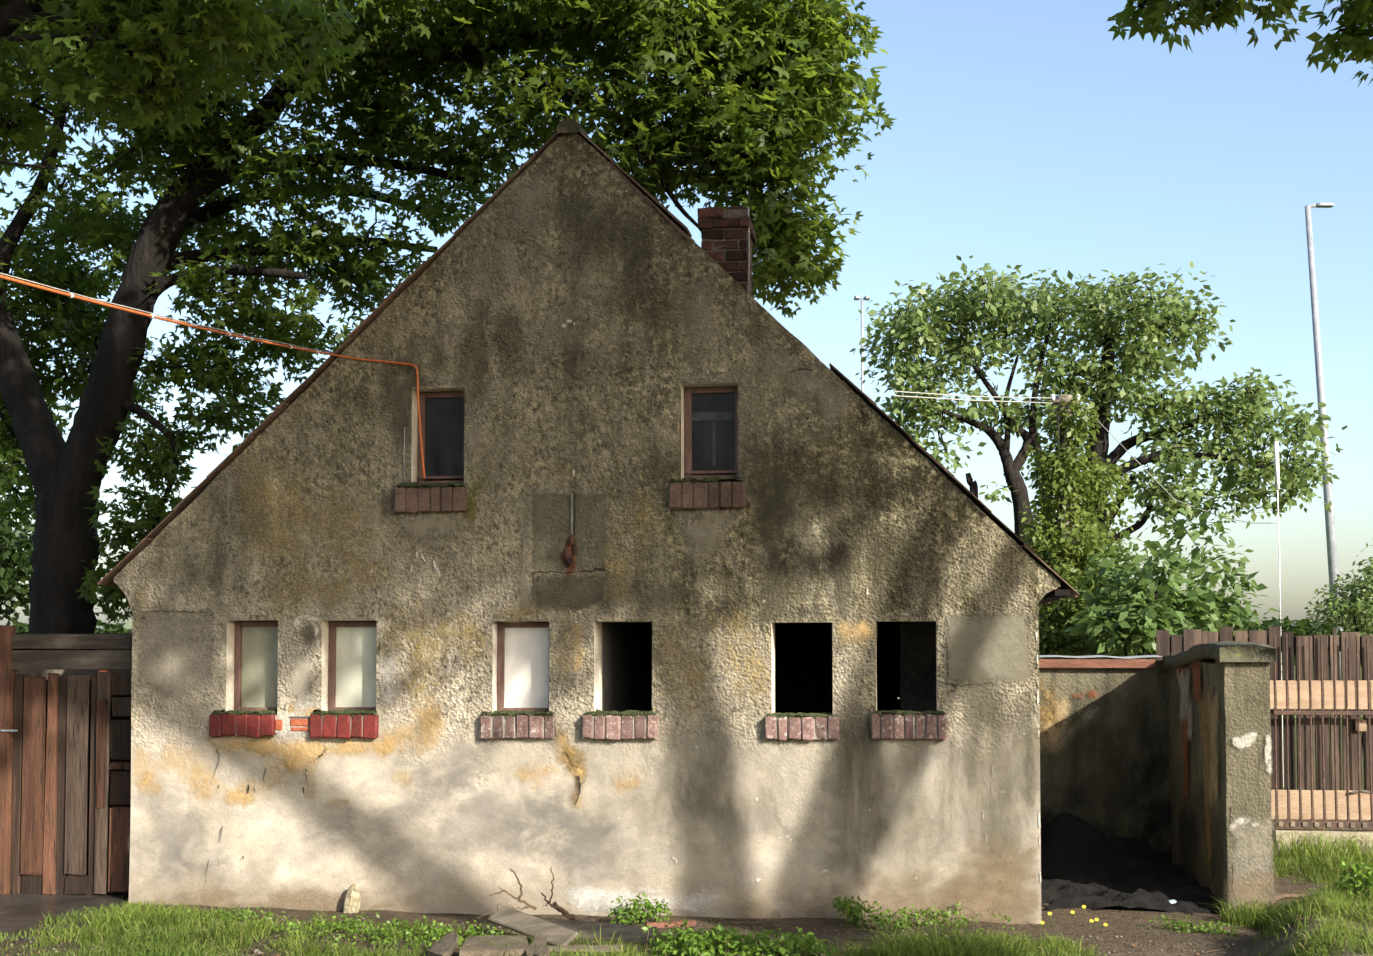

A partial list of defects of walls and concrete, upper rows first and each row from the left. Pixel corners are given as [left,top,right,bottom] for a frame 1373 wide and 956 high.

spalling [1233,732,1271,773]
water stain [851,787,1035,924]